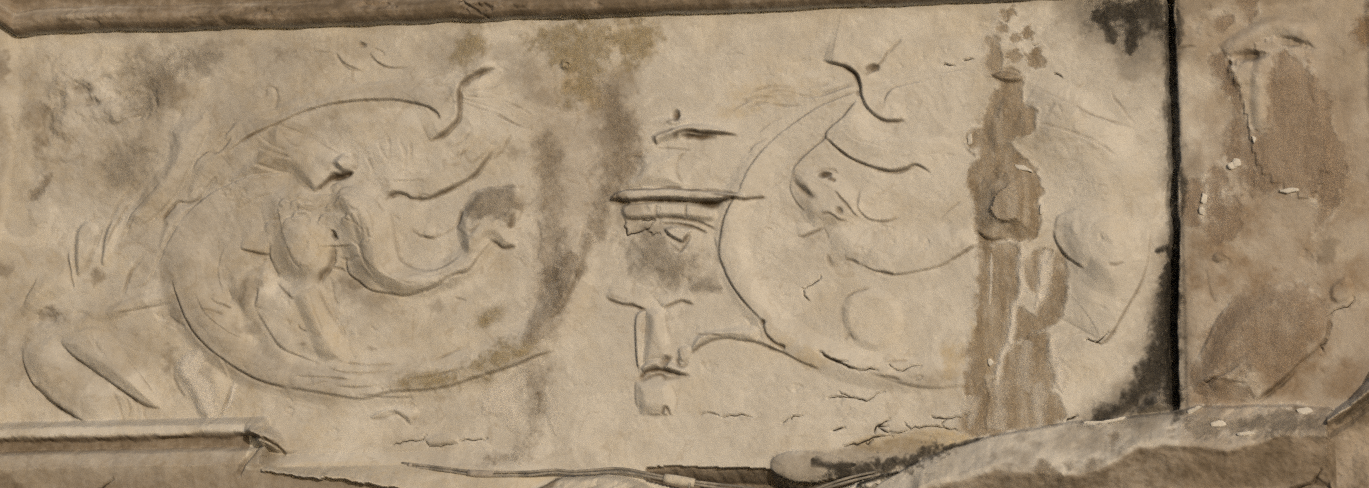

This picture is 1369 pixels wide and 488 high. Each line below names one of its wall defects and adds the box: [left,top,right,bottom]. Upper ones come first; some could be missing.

leakage [1092,0,1187,421]
spalling [1182,51,1344,244]
leakage [811,248,1053,486]
leakage [1048,339,1067,393]
peeling [1083,416,1127,426]
peeling [1187,406,1319,437]